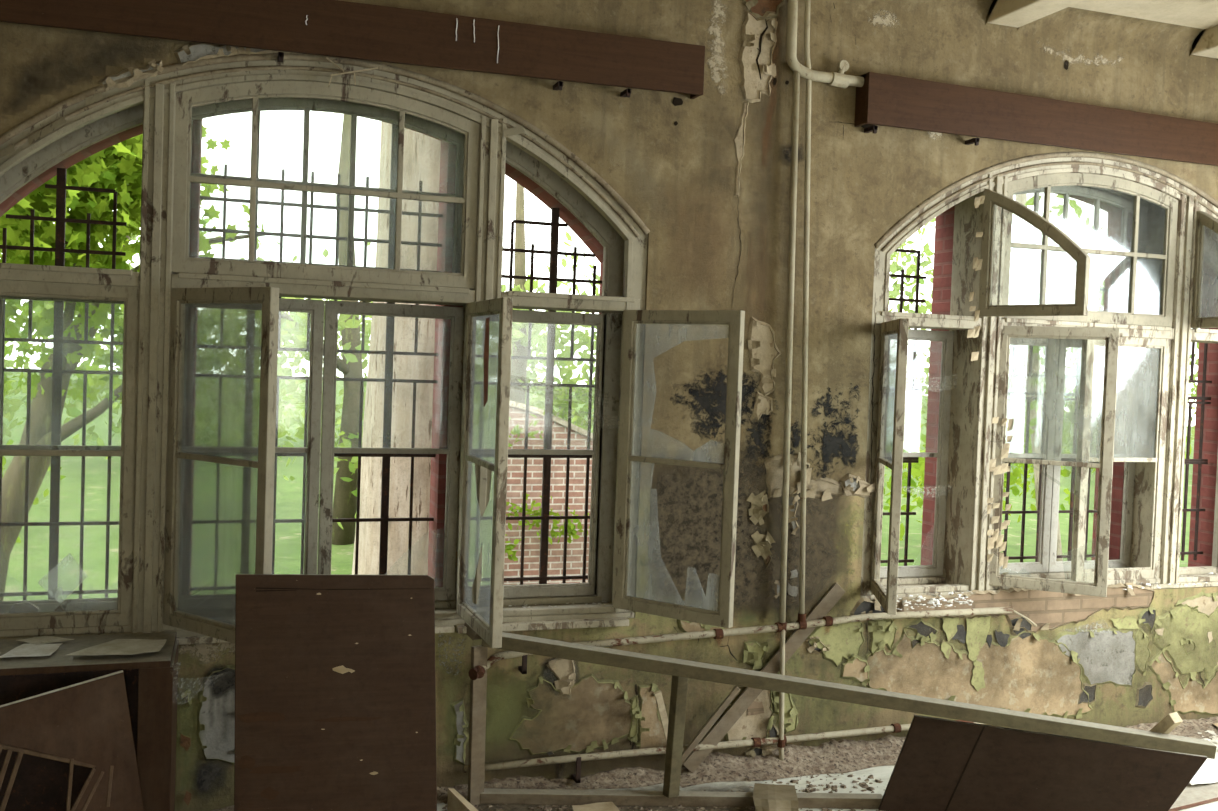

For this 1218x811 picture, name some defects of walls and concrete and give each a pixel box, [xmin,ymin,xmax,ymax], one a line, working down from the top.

flaking render [733,0,789,196]
water stain [671,370,727,446]
spalling [747,316,781,421]
water stain [790,383,859,478]
water stain [648,457,724,608]
water stain [733,375,842,615]
peeling [805,582,1218,719]
spalling [195,665,235,764]
peeling [507,658,667,756]